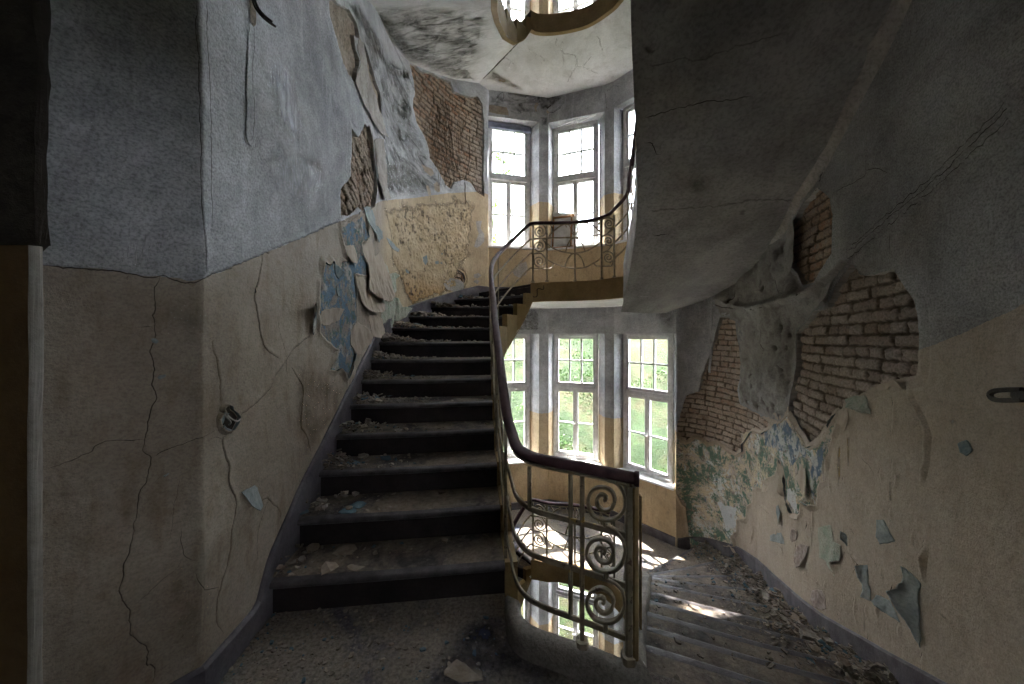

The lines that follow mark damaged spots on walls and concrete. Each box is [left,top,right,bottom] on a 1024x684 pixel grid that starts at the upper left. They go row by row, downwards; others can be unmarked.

flaking render [325,0,392,201]
leakage [355,7,439,190]
leakage [395,13,481,67]
peeling [312,206,412,389]
flaking render [444,267,481,292]
peeling [785,219,794,272]
crack [137,434,283,633]
peeling [676,408,847,577]
peeling [854,565,921,648]